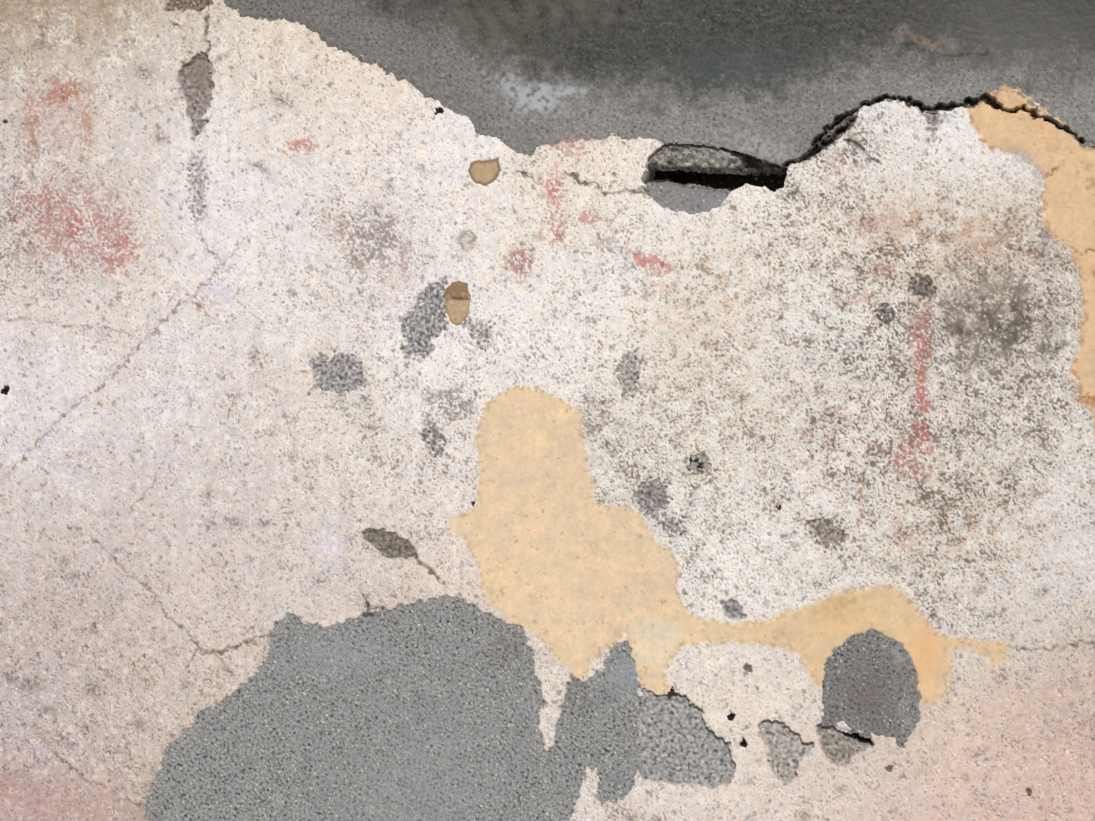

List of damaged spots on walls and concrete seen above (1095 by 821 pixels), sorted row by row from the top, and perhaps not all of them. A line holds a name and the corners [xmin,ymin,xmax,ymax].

spalling [179,52,215,222]
crack [782,93,1086,175]
spalling [645,143,787,214]
crack [193,219,244,266]
crack [1073,247,1095,259]
crack [0,298,187,482]
crack [125,470,162,519]
spalling [631,476,690,538]
spalling [363,528,416,559]
crack [61,524,273,676]
spalling [627,688,736,788]
spalling [760,720,873,780]